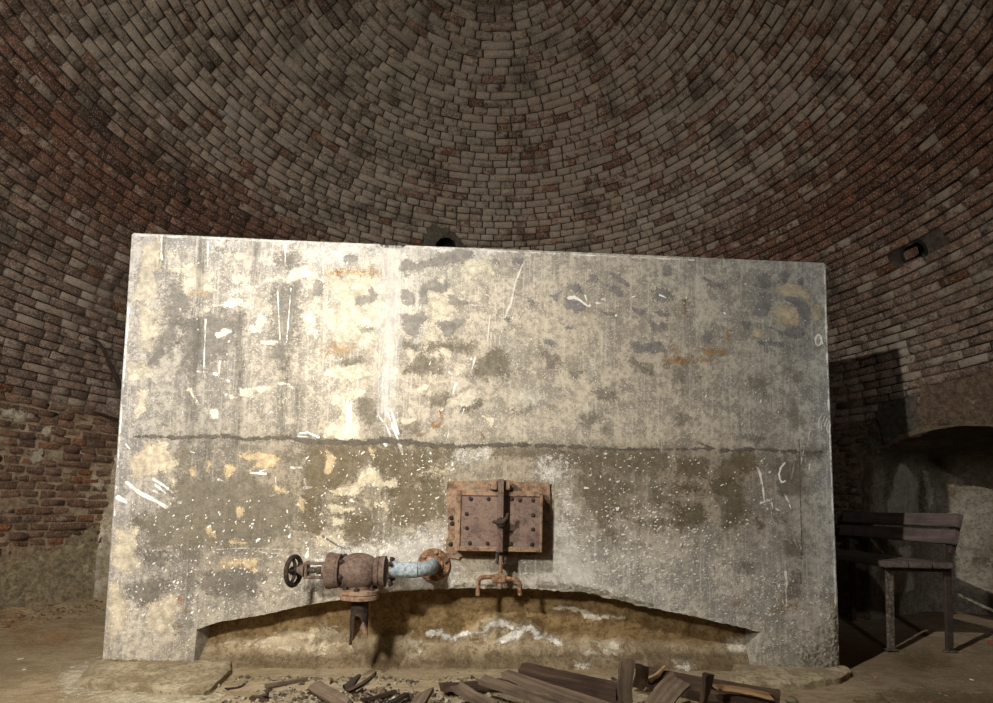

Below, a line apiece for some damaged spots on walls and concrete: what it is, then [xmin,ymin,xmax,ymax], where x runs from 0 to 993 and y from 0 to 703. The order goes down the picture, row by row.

peeling [30,425,54,467]
peeling [89,474,104,491]
leakage [114,306,130,516]
leakage [127,395,766,607]
leakage [400,305,545,414]
leakage [541,351,560,369]
leakage [571,358,618,402]
leakage [760,402,836,606]